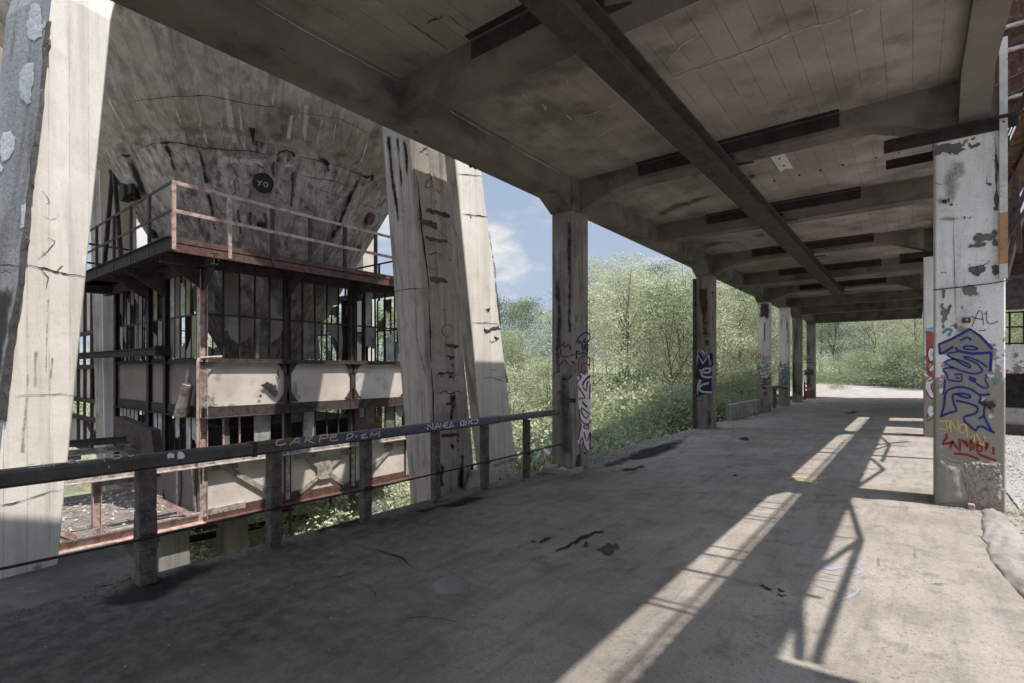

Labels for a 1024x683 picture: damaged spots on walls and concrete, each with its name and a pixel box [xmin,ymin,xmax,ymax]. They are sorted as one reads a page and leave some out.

crack [117,95,370,134]
crack [136,142,377,210]
leakage [385,136,408,225]
peeling [934,142,980,156]
peeling [986,155,999,211]
spalling [0,3,51,422]
crack [0,191,86,288]
spalling [968,230,998,248]
spalling [963,461,1003,507]
crack [531,530,604,551]